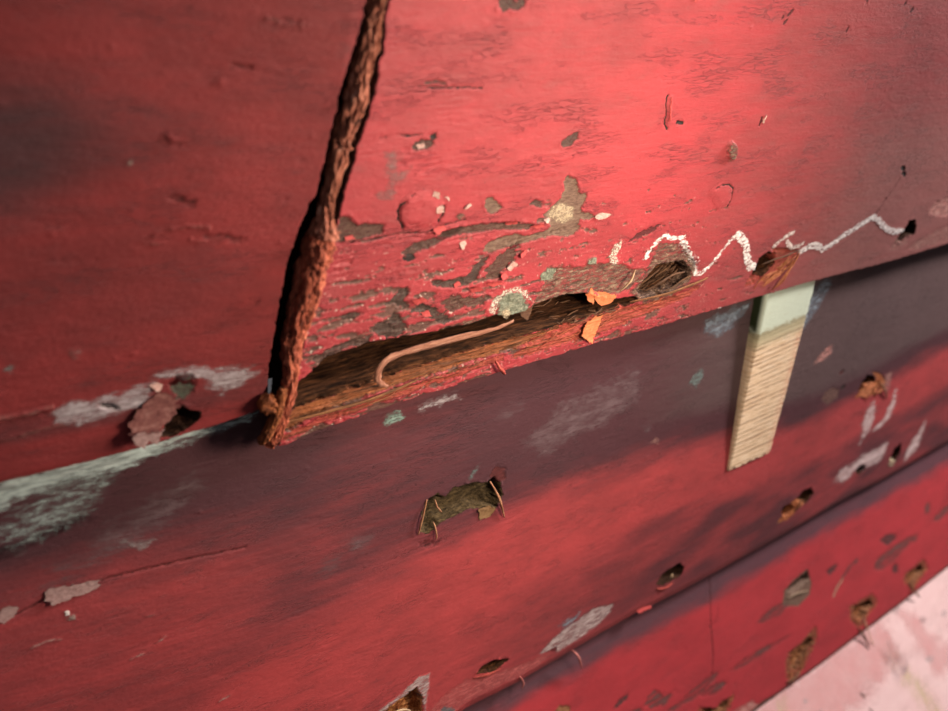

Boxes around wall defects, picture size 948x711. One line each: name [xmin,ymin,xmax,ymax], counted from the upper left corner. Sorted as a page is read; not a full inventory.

peeling [498,0,525,12]
spalling [292,175,691,409]
peeling [127,376,202,449]
spalling [890,443,901,461]
hole [420,480,504,534]
hole [797,487,814,504]
peeling [44,561,175,606]
spalling [656,563,685,586]
peeling [0,606,22,624]
peeling [751,534,948,711]
peeling [385,604,613,711]
peeling [635,673,728,711]